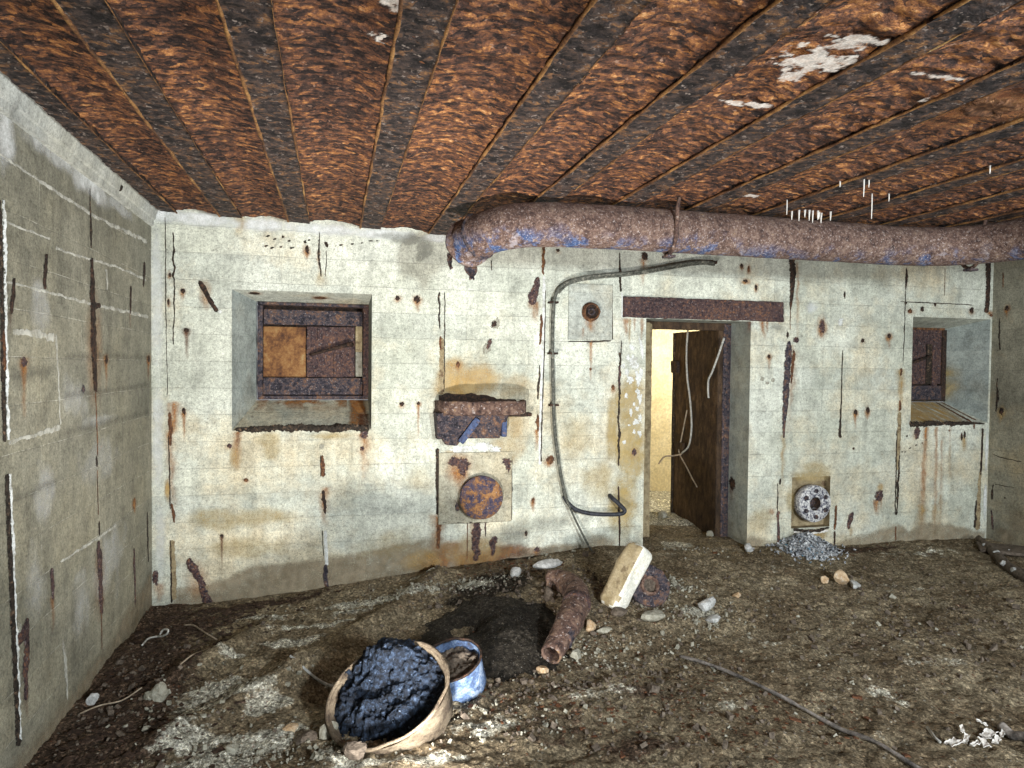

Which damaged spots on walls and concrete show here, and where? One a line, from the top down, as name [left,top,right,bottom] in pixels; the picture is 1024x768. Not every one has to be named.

rust [528,277,540,306]
rust [167,403,186,446]
rust [448,452,470,482]
water stain [607,378,644,527]
rust [911,370,976,490]
water stain [174,517,438,604]
rust [409,523,540,569]